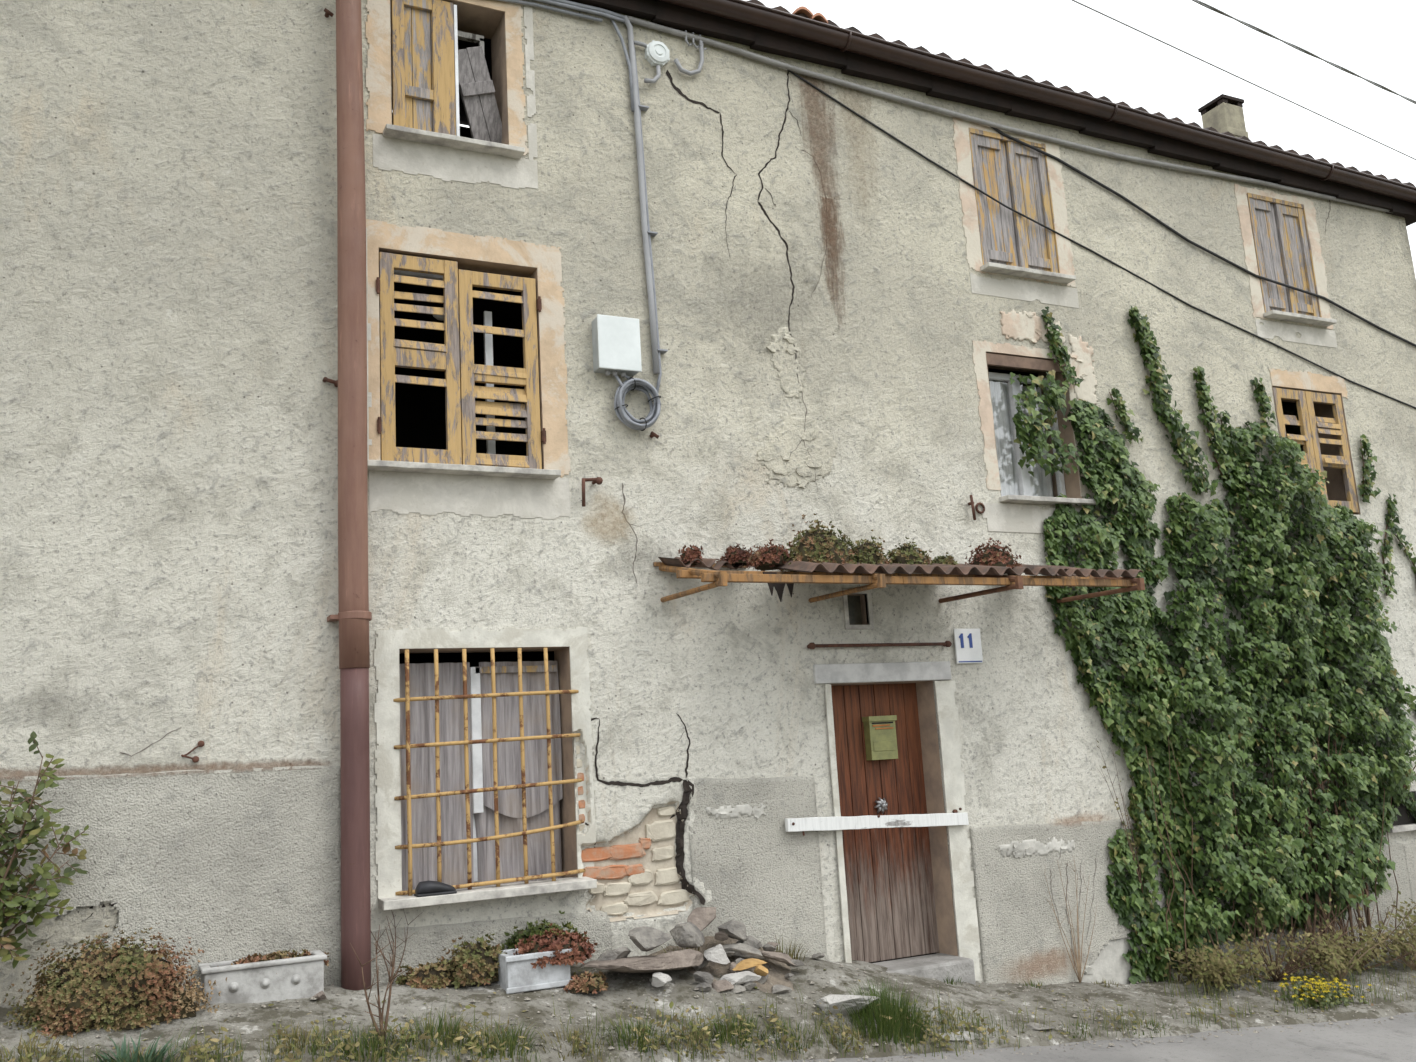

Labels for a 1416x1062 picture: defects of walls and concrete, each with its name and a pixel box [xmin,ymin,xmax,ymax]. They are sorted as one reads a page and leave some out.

leakage [800,75,838,278]
crack [666,70,818,489]
spalling [572,733,694,922]
crack [591,713,712,905]